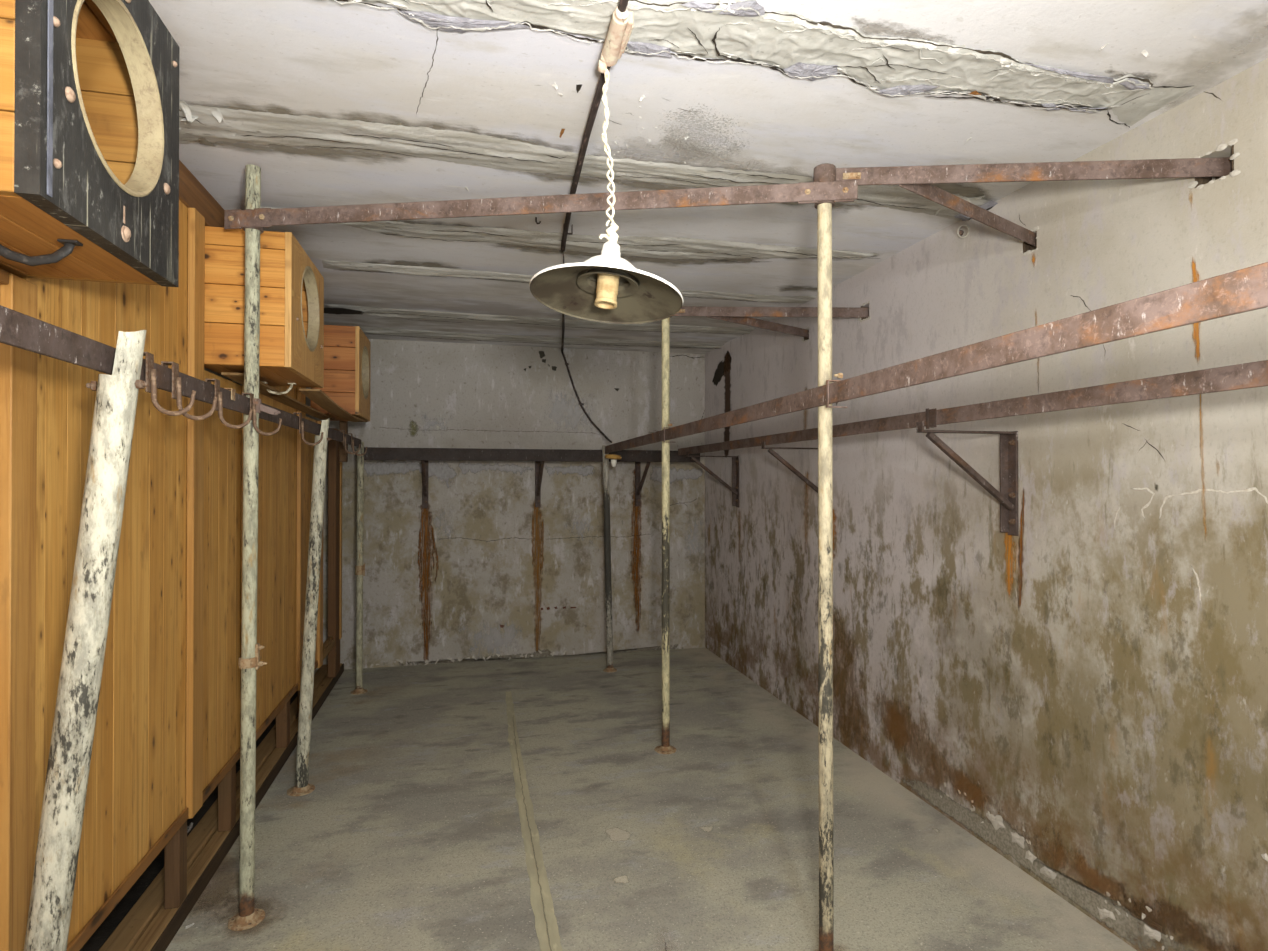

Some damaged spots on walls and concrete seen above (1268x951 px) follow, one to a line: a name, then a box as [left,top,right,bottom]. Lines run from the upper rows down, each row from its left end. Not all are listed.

peeling [399,11,530,33]
peeling [772,62,847,81]
corrosion [418,504,439,662]
corrosion [530,502,544,652]
corrosion [631,470,642,631]
corrosion [1004,490,1025,609]
crack [1114,487,1268,528]
crack [1192,567,1201,601]
leakage [833,615,860,742]
leakage [877,695,988,808]
spalling [903,779,1190,951]
leakage [1025,836,1237,951]